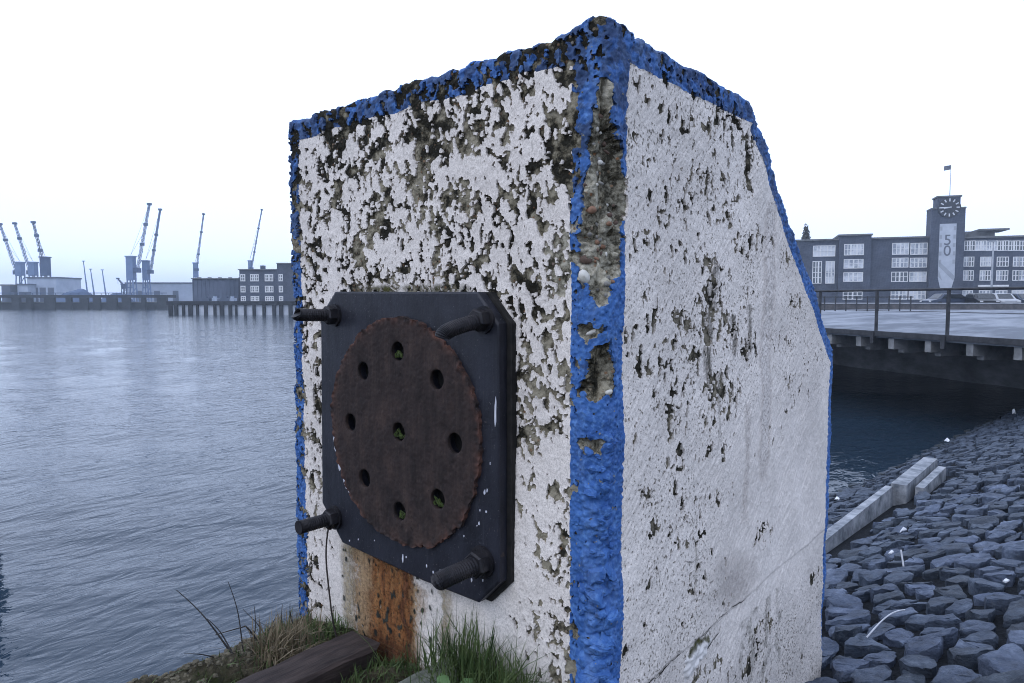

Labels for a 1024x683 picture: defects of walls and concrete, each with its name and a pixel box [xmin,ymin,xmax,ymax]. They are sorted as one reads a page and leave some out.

corrosion [342,544,450,664]
peeling [290,16,634,683]